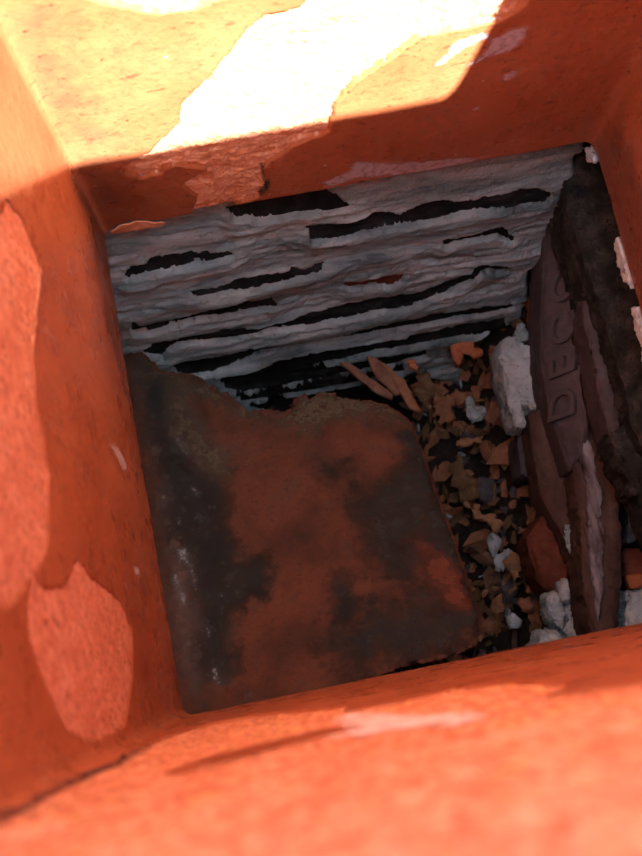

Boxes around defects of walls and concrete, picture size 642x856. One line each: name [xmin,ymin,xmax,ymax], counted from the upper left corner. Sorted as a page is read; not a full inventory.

spalling [122,0,522,209]
spalling [111,220,165,234]
spalling [0,201,131,740]
spalling [123,352,482,714]
spalling [0,685,642,856]